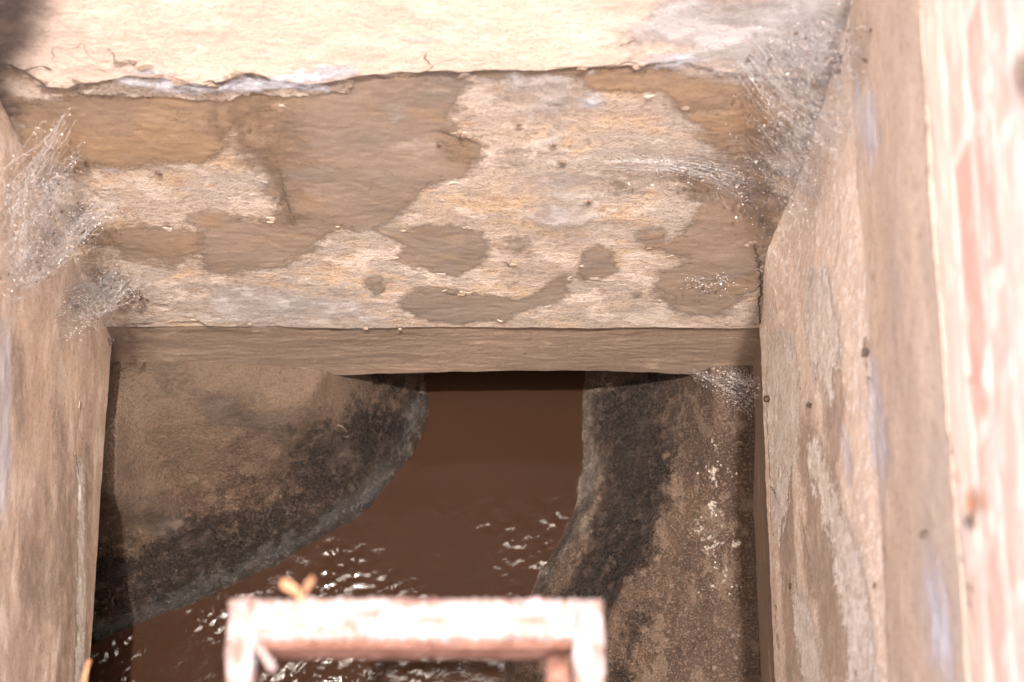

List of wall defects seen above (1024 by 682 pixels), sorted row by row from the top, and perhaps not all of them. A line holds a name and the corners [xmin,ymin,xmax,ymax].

water stain [119,65,353,193]
crack [745,240,765,324]
water stain [46,373,429,682]
water stain [543,372,685,682]